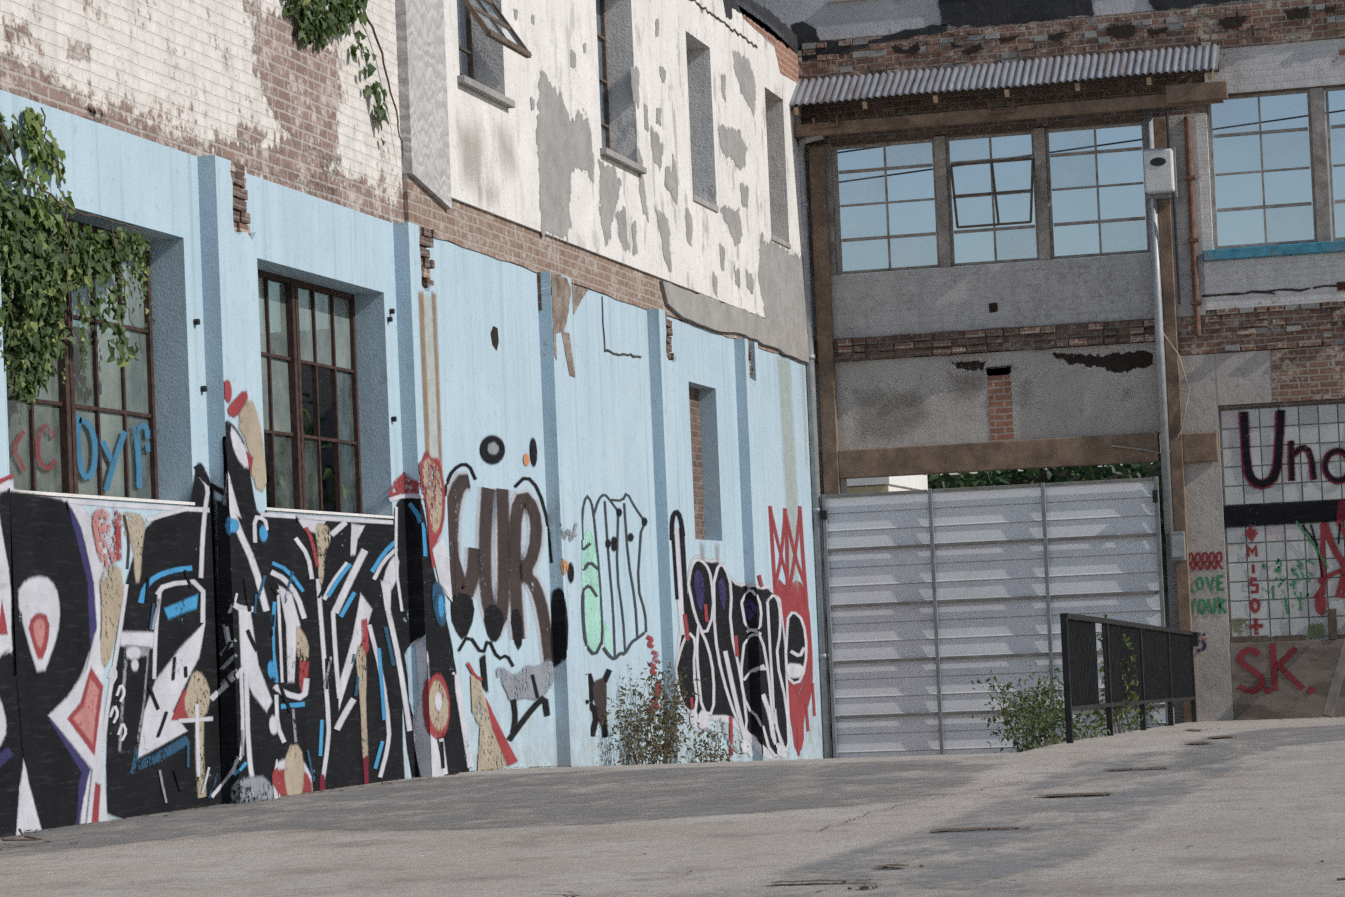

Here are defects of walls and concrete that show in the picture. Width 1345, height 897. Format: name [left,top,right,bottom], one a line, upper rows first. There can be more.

spalling [739,3,1269,83]
peeling [0,0,404,236]
flaking render [721,51,756,116]
flaking render [531,65,693,272]
spalling [419,226,435,287]
spalling [491,326,499,350]
flaking render [537,272,588,377]
spalling [665,312,674,360]
flaking render [713,124,807,334]
crack [1202,285,1337,297]
spalling [1205,301,1345,351]
spalling [837,320,1164,442]